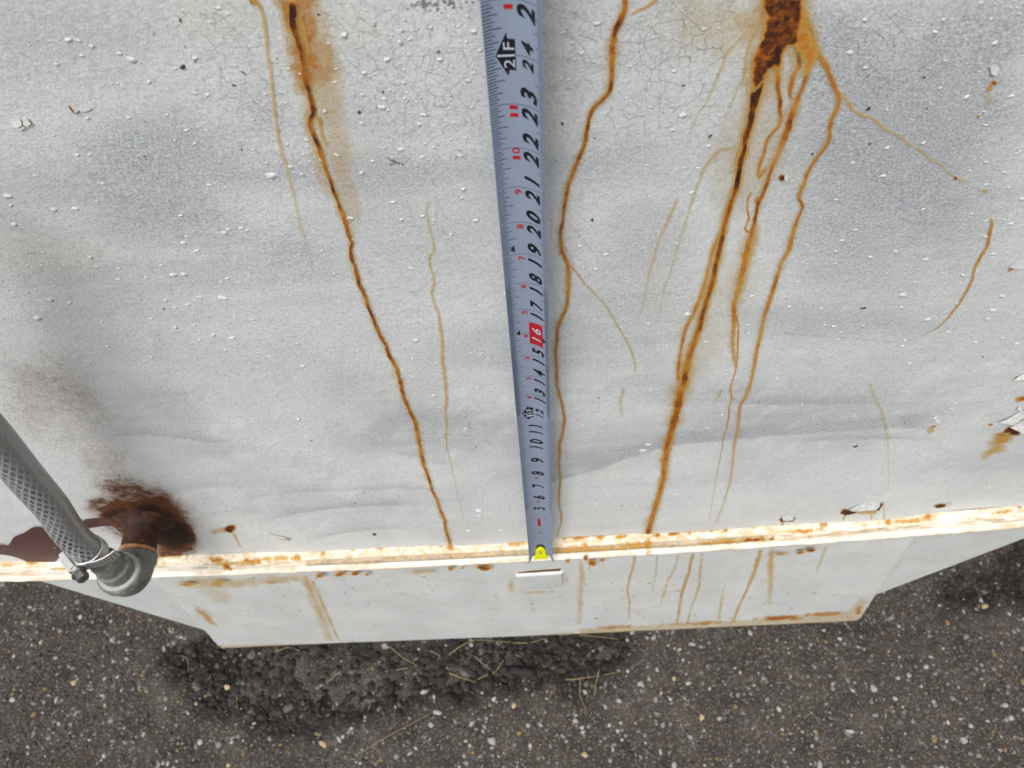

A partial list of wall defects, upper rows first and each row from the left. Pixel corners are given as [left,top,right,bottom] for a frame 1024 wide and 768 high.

corrosion [277,0,466,551]
corrosion [554,0,954,629]
corrosion [922,219,994,336]
peeling [984,396,1024,457]
corrosion [87,475,196,562]
peeling [840,500,883,516]
corrosion [210,554,301,587]
corrosion [303,571,369,635]